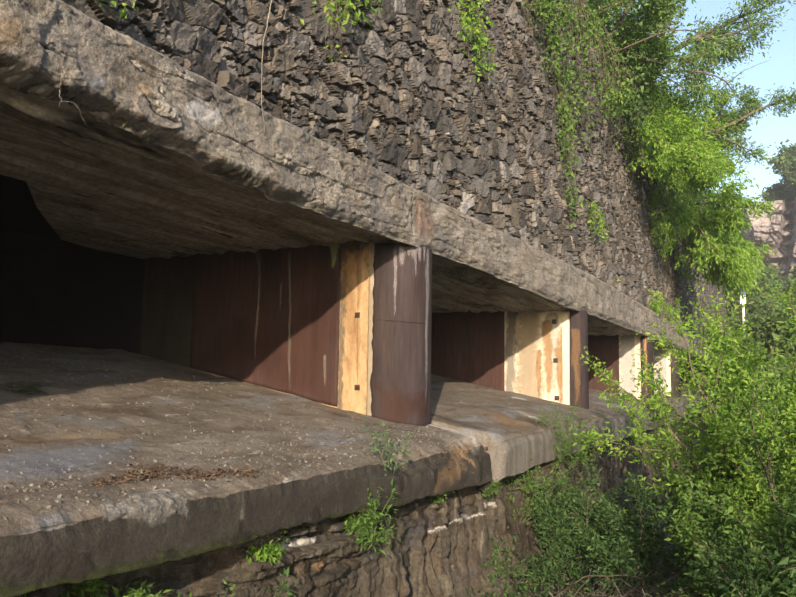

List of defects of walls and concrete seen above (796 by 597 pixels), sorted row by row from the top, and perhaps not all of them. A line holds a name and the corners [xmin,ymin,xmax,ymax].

rust [536,321,563,402]